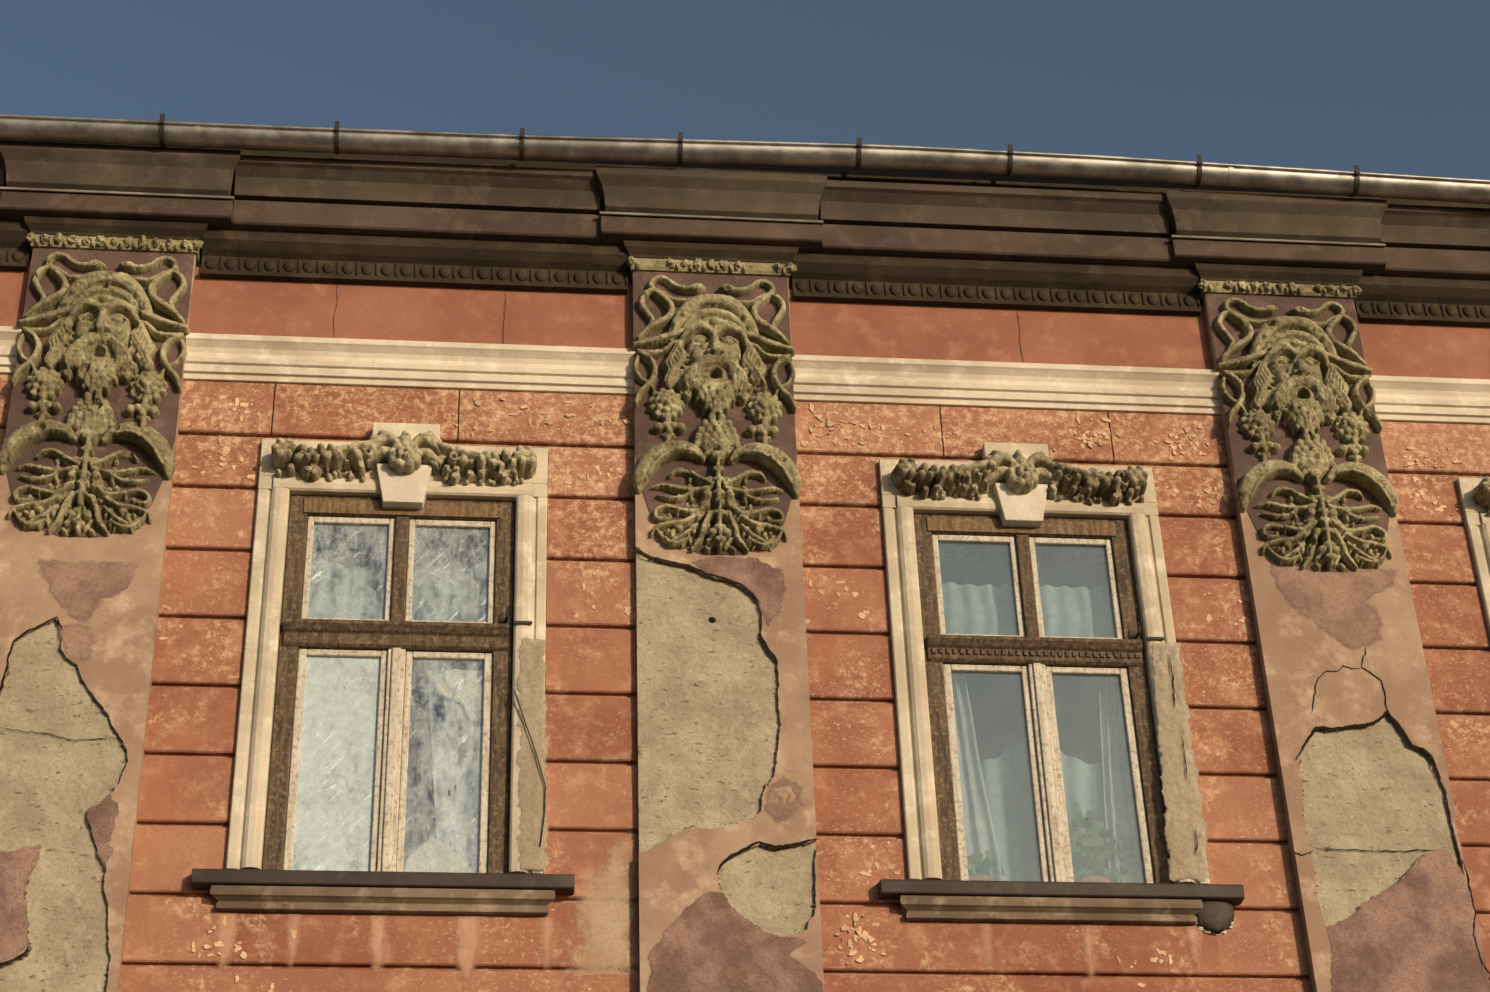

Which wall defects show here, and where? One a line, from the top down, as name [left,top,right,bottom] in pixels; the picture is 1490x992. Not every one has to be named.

flaking render [0,560,138,992]
flaking render [624,550,801,853]
crack [1296,646,1441,777]
peeling [647,842,831,992]
peeling [859,842,900,886]